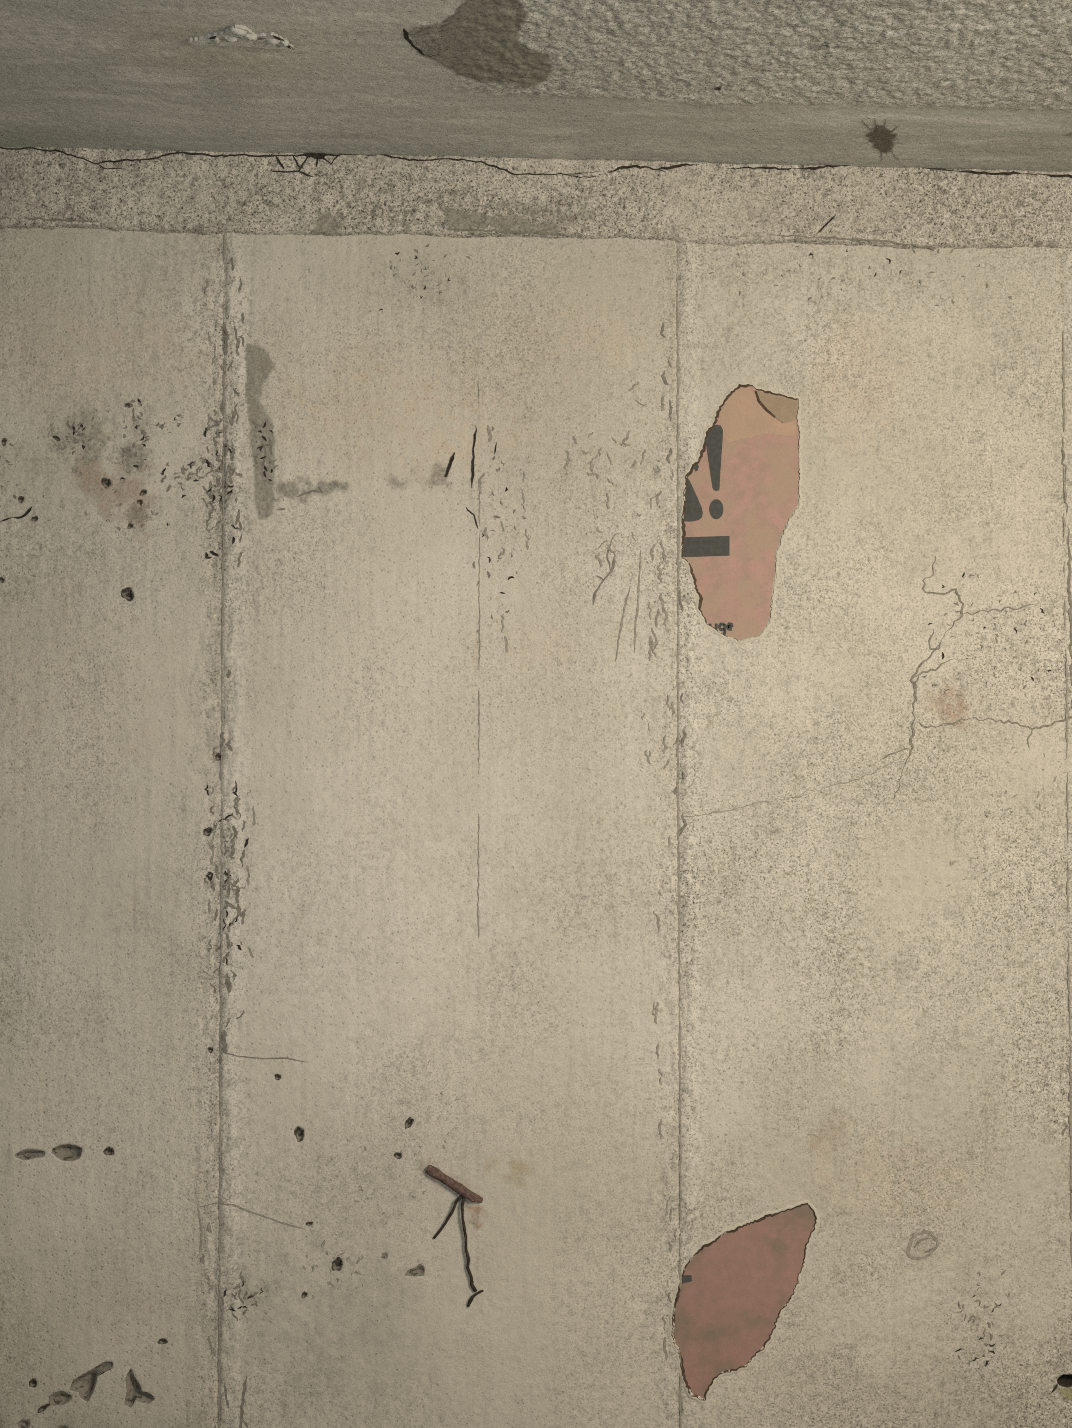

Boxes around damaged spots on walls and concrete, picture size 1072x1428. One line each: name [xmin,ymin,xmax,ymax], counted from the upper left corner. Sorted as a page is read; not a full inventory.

leakage [401,0,551,88]
leakage [246,345,348,519]
peeling [679,381,803,645]
crack [686,440,1072,817]
peeling [668,1200,820,1404]